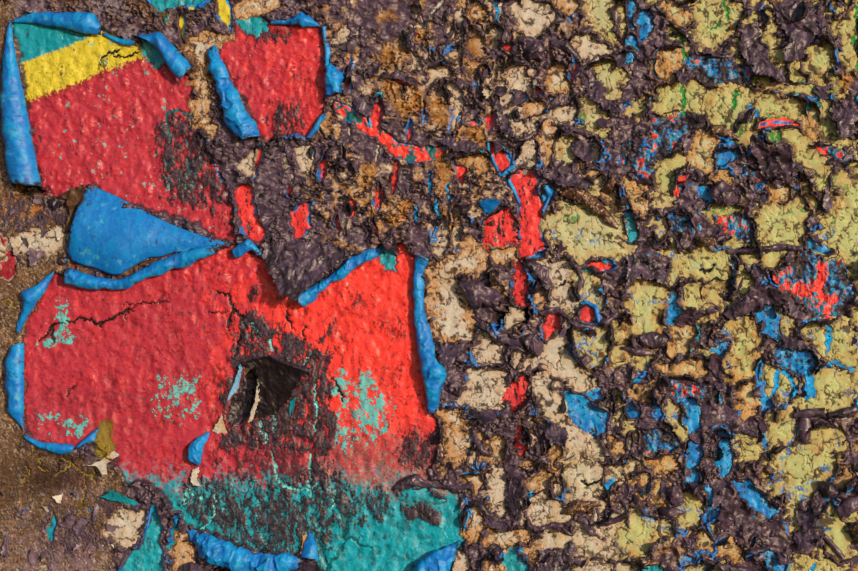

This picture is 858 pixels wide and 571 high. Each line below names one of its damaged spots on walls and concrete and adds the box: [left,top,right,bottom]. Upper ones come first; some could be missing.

peeling [456,0,488,22]
peeling [426,10,488,89]
peeling [474,58,498,107]
peeling [543,57,577,95]
peeling [443,77,466,131]
peeling [536,184,554,213]
crack [39,300,169,344]
peeling [298,404,326,435]
peeling [245,540,286,553]
peeling [696,527,716,552]